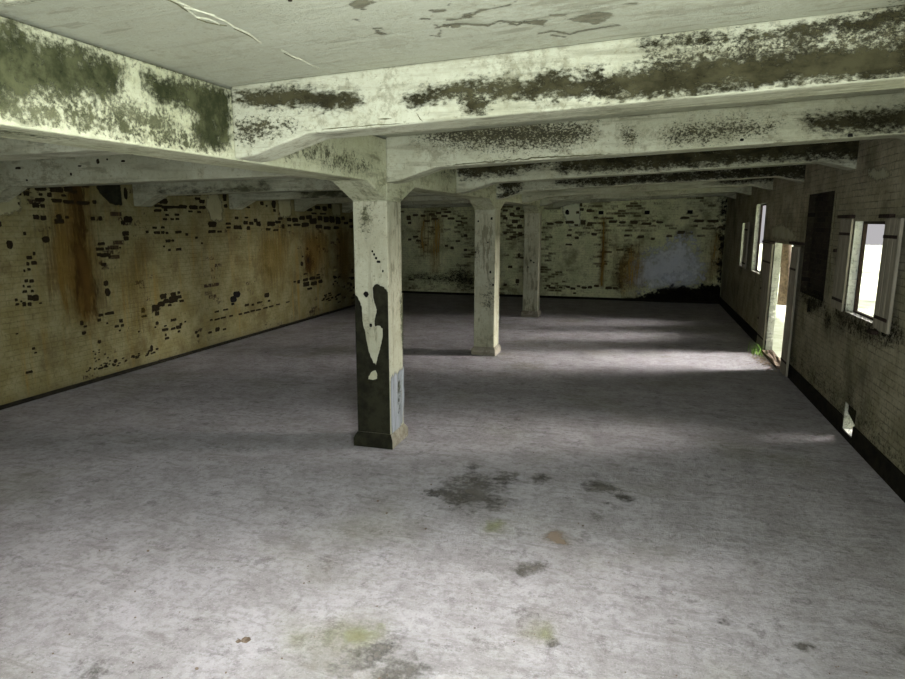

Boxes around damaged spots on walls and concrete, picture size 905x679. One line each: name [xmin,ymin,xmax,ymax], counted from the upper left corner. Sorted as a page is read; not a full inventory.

damp [0,19,364,153]
crack [167,0,319,69]
peeling [420,4,621,38]
damp [402,0,905,116]
damp [414,102,905,198]
flaking render [18,179,128,224]
corrosion [53,186,99,321]
flaking render [208,200,353,233]
damp [301,190,348,198]
flaking render [86,291,186,372]
spalling [293,248,390,434]
damp [349,643,429,679]